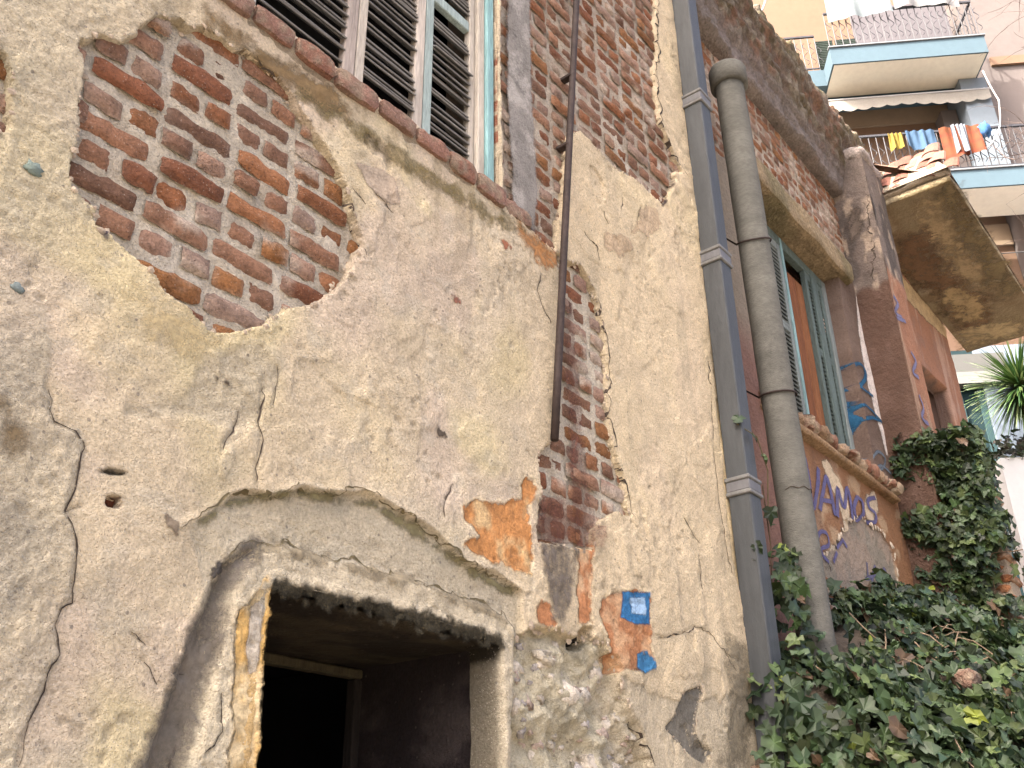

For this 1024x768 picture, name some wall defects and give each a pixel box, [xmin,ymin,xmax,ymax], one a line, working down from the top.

flaking render [0,59,16,134]
flaking render [69,14,362,335]
crack [858,189,876,281]
crack [223,367,278,480]
flaking render [463,0,684,768]
flaking render [822,459,899,581]
crack [18,390,85,767]
crack [661,626,735,668]
flaking render [665,684,712,766]